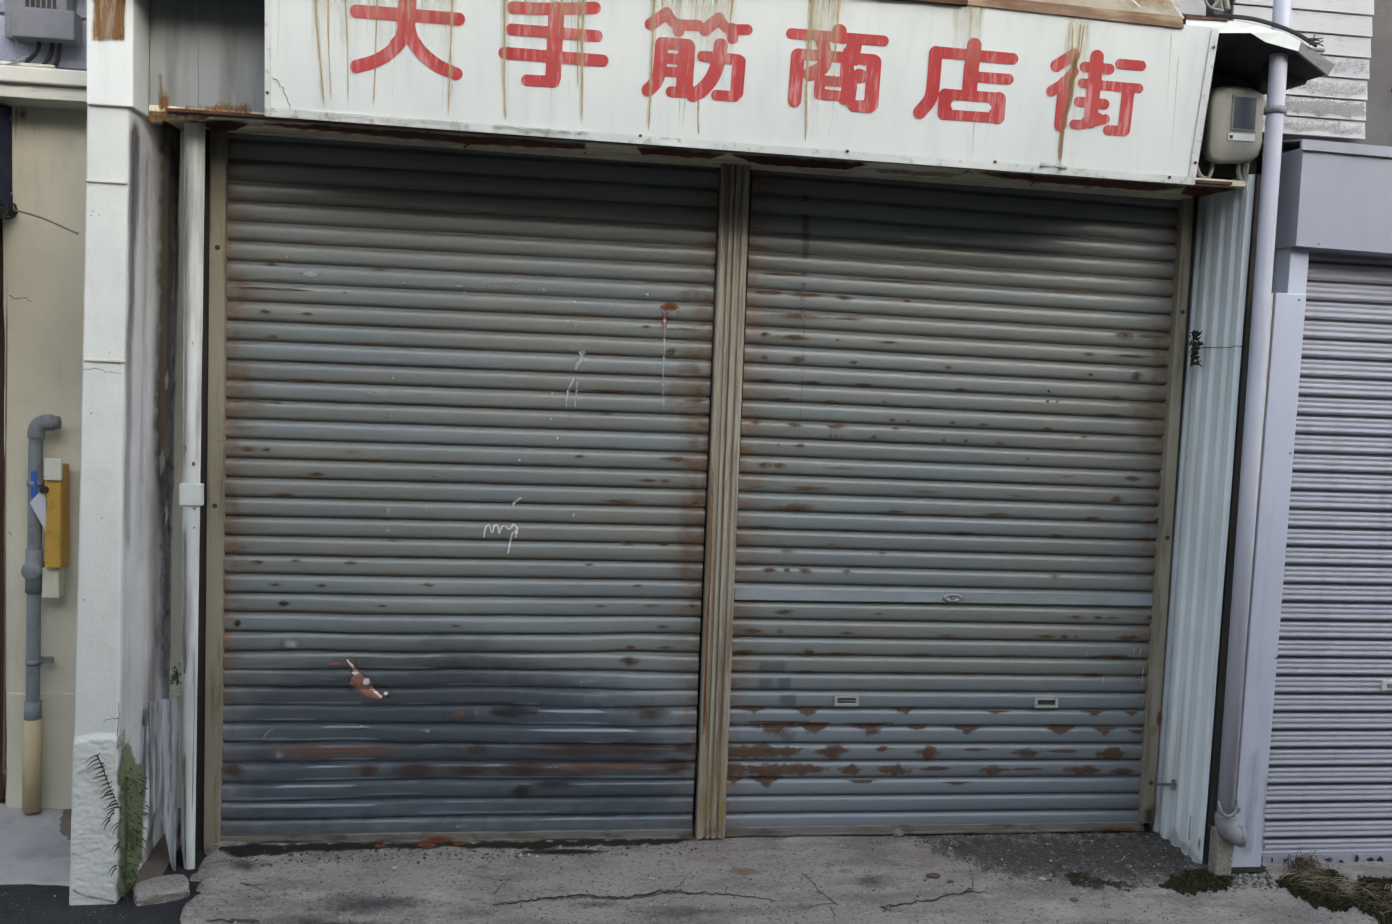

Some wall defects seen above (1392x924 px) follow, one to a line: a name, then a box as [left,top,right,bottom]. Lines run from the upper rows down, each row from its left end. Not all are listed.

rust [93,0,126,41]
rust [315,0,349,104]
rust [558,0,584,119]
rust [805,0,815,139]
water stain [128,120,187,675]
rust [450,454,967,825]
rust [951,710,1162,775]
water stain [183,736,194,862]
crack [206,882,270,924]
crack [493,875,775,905]
crack [801,873,838,924]
crack [881,875,986,911]